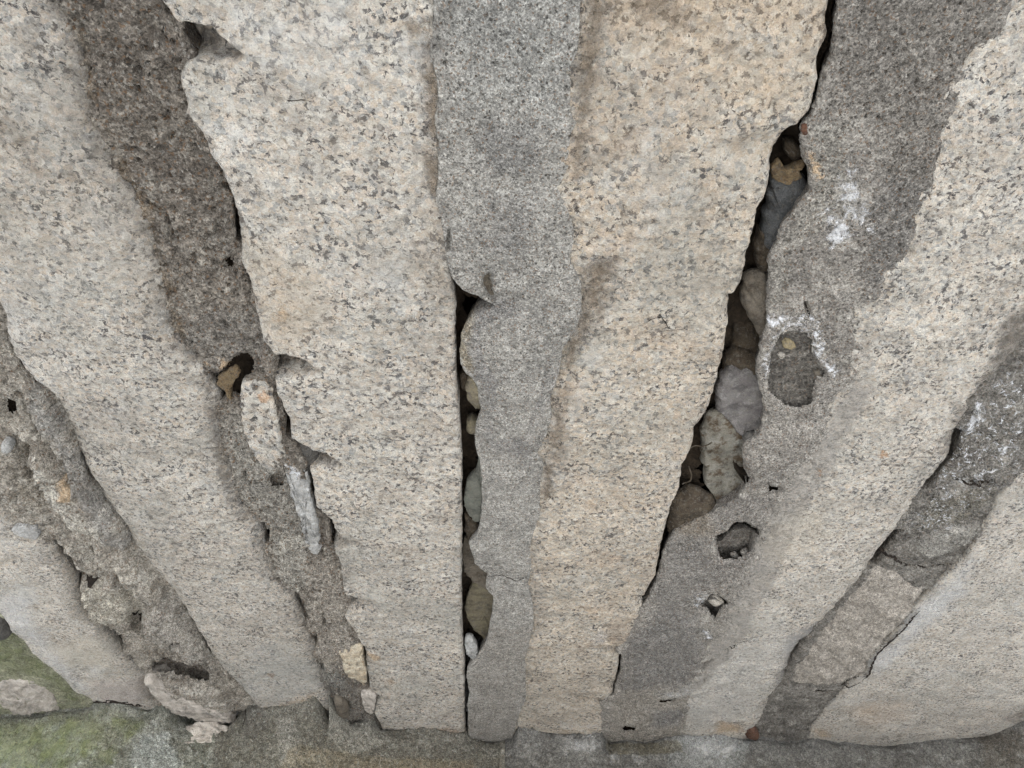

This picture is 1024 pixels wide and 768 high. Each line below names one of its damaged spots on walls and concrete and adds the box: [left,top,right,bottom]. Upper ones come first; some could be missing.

water stain [829,224,847,243]
crack [679,119,801,488]
spalling [768,331,825,407]
crack [455,284,524,656]
crack [656,524,668,571]
spalling [715,522,759,559]
crack [879,545,944,568]
crack [86,574,99,588]
crack [815,612,919,692]